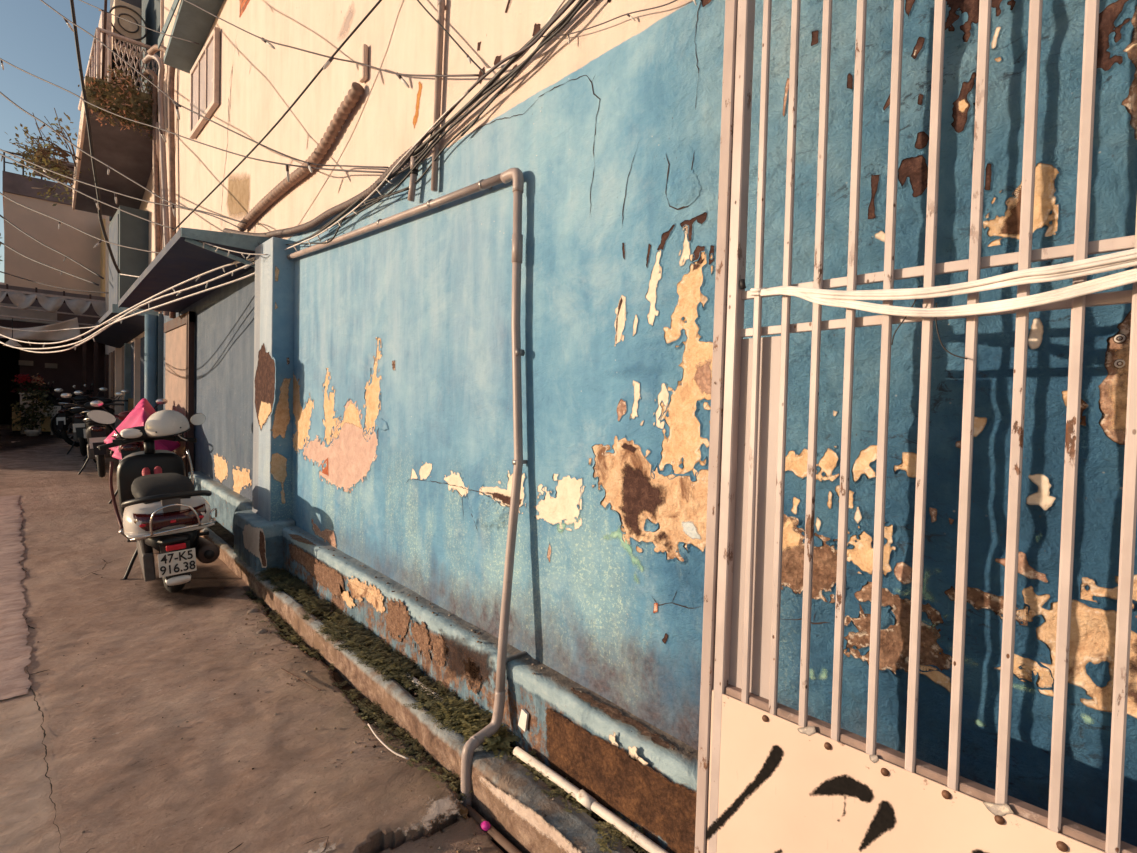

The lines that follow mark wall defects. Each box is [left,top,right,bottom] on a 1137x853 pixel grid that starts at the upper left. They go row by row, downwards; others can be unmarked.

crack [476,74,600,211]
crack [665,151,695,210]
peeling [945,0,1020,64]
peeling [982,160,1063,248]
peeling [1096,0,1137,145]
peeling [254,336,396,504]
peeling [410,211,716,564]
spalling [1080,303,1132,449]
spalling [288,518,449,668]
spalling [781,444,1119,716]
spalling [1127,572,1137,721]
crack [27,669,94,853]